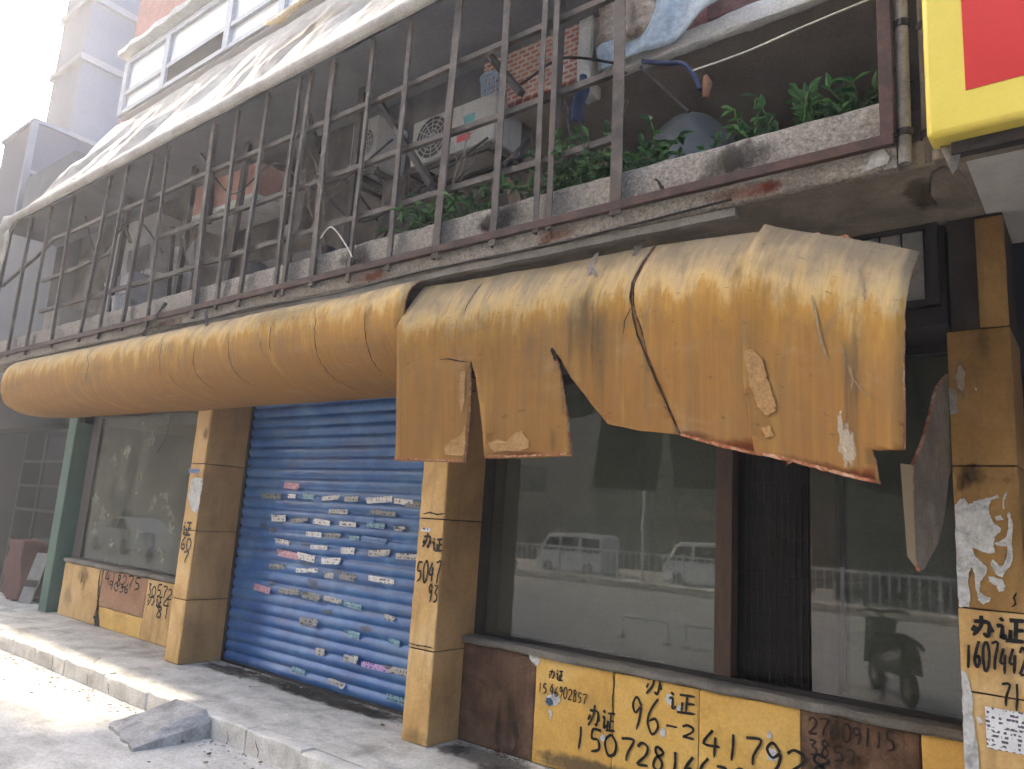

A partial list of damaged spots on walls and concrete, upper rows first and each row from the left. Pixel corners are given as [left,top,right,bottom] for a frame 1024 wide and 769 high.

crack [314,306,381,392]
crack [623,247,677,431]
peeling [744,348,777,439]
peeling [488,431,529,453]
peeling [188,477,203,513]
crack [93,570,101,615]
peeling [955,492,1013,607]